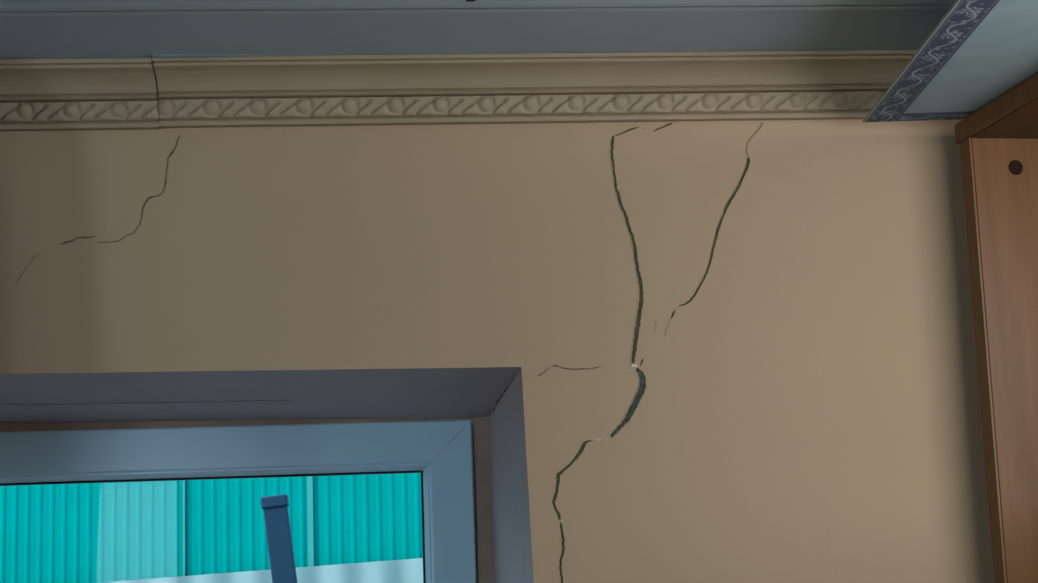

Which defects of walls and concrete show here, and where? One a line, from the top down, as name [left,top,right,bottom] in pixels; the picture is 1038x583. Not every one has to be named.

crack [61,133,182,244]
crack [671,158,750,319]
crack [552,121,680,583]